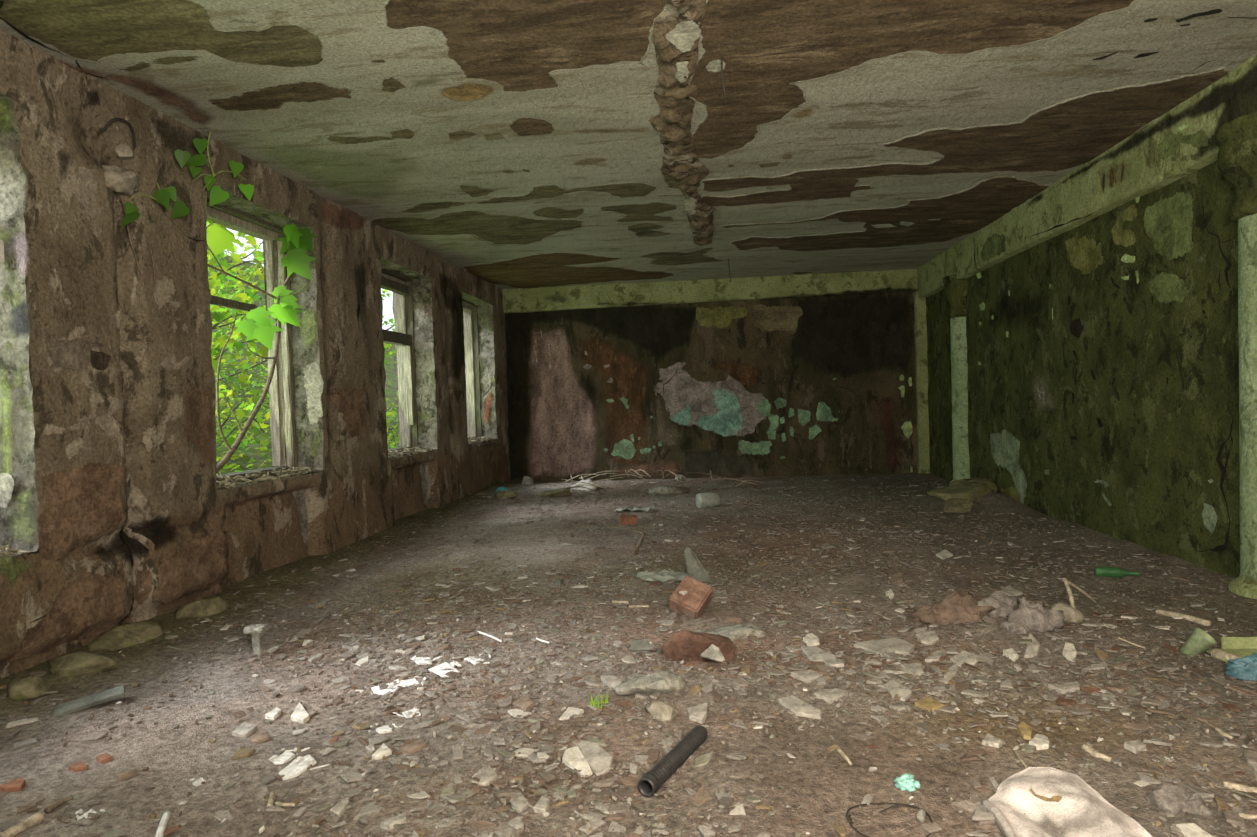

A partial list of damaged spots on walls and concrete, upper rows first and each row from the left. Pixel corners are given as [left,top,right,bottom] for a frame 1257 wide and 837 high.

peeling [0,0,353,111]
peeling [0,145,25,221]
peeling [326,129,415,144]
peeling [370,0,1231,302]
peeling [16,234,26,275]
leakage [477,302,695,490]
peeling [654,362,840,459]